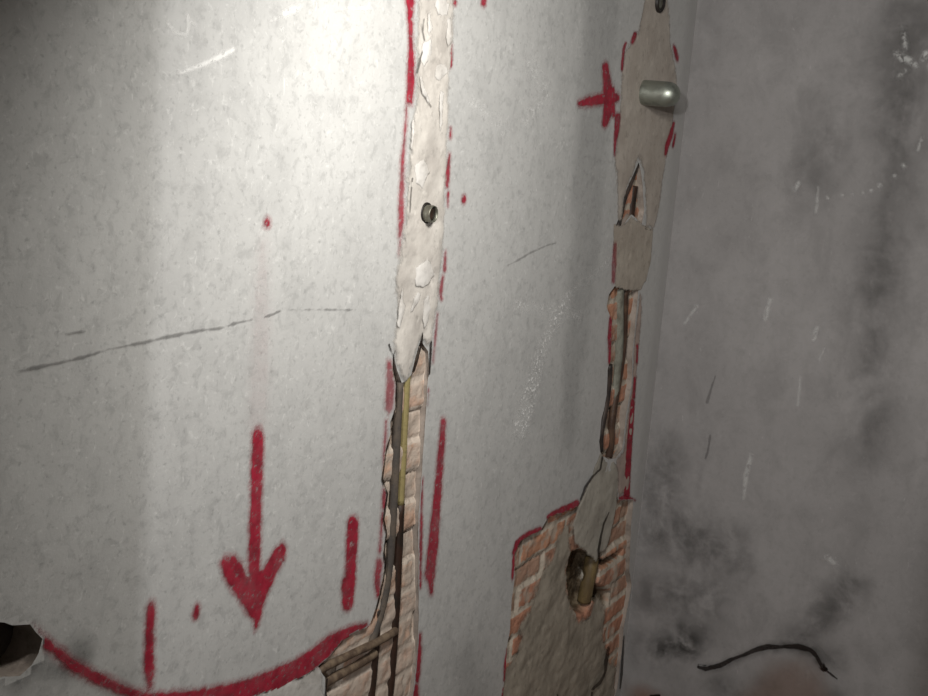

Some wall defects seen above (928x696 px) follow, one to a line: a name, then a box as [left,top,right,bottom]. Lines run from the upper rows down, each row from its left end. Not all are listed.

peeling [397,259,434,328]
flaking render [600,286,638,459]
spalling [0,624,42,677]
flaking render [314,340,429,696]
flaking render [506,486,633,696]
crack [697,644,837,679]